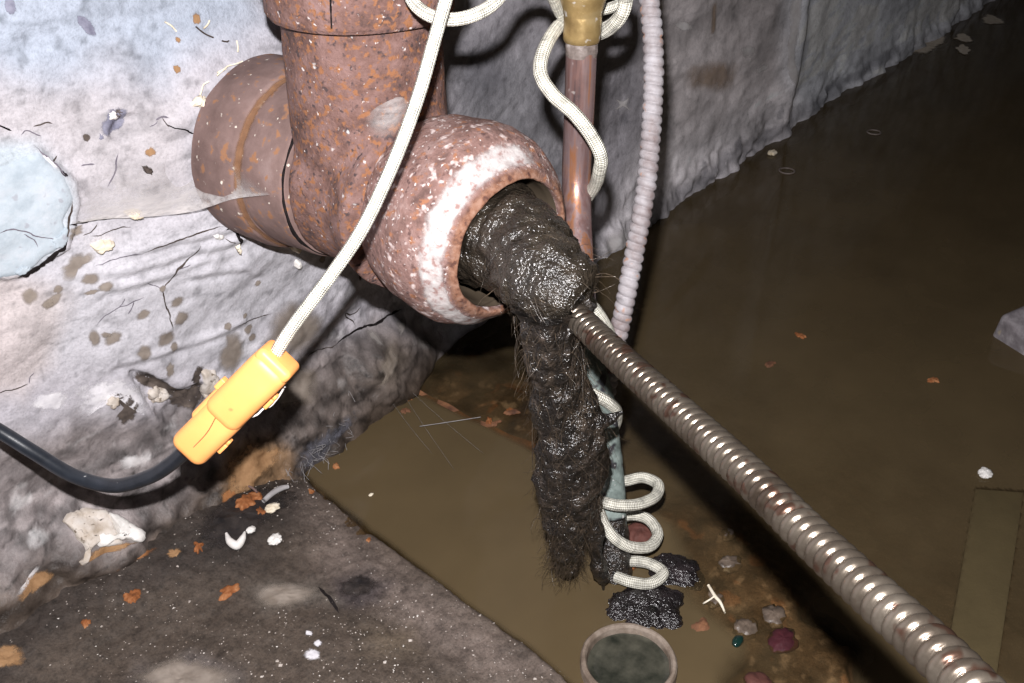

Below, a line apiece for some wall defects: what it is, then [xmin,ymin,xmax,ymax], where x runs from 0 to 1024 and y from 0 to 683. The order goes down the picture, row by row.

crack [150,116,193,134]
peeling [0,153,73,278]
crack [67,217,127,239]
leakage [23,255,112,309]
crack [96,226,243,327]
leakage [89,331,121,345]
leakage [138,297,187,360]
leakage [221,313,255,368]
crack [308,308,402,356]
flaking render [106,367,220,424]